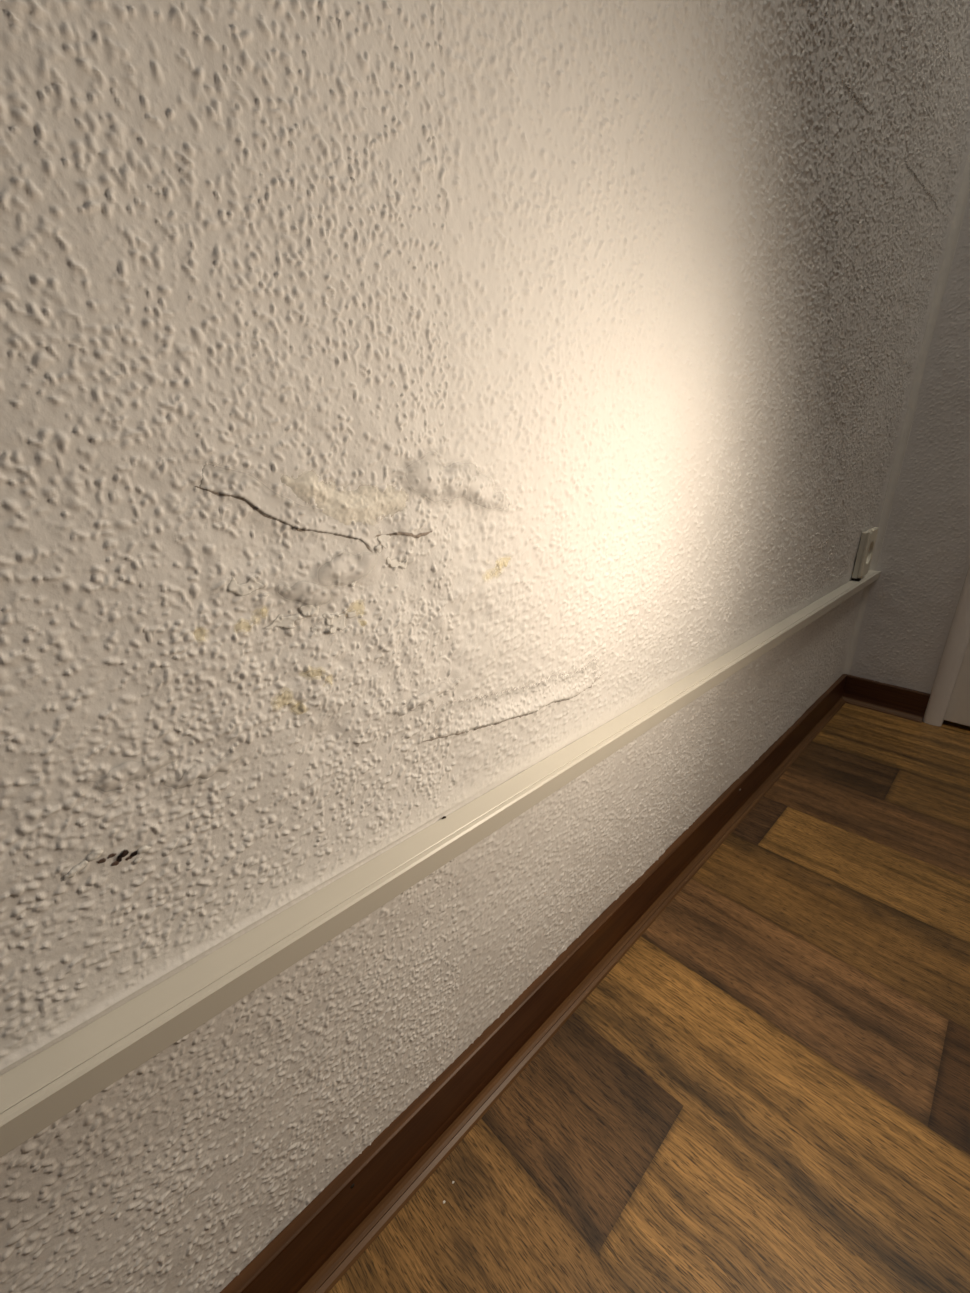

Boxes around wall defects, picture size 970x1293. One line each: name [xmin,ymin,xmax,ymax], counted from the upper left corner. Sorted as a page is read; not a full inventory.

crack [195,466,432,555]